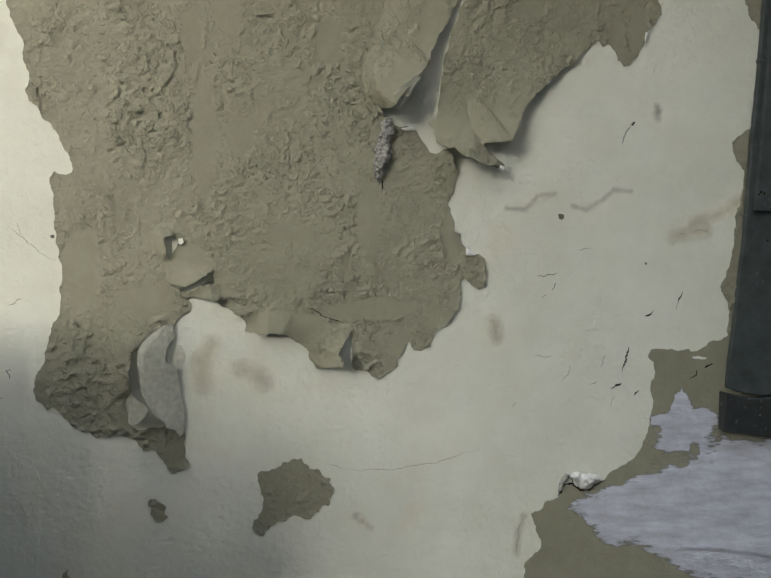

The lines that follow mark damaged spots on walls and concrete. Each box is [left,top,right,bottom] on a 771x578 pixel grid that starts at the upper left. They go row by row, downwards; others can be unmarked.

peeling [745,0,762,29]
peeling [360,0,458,113]
peeling [381,0,603,170]
peeling [164,236,215,291]
peeling [199,285,232,311]
peeling [232,295,353,368]
peeling [126,325,185,436]
peeling [252,458,334,536]
peeling [562,472,602,492]